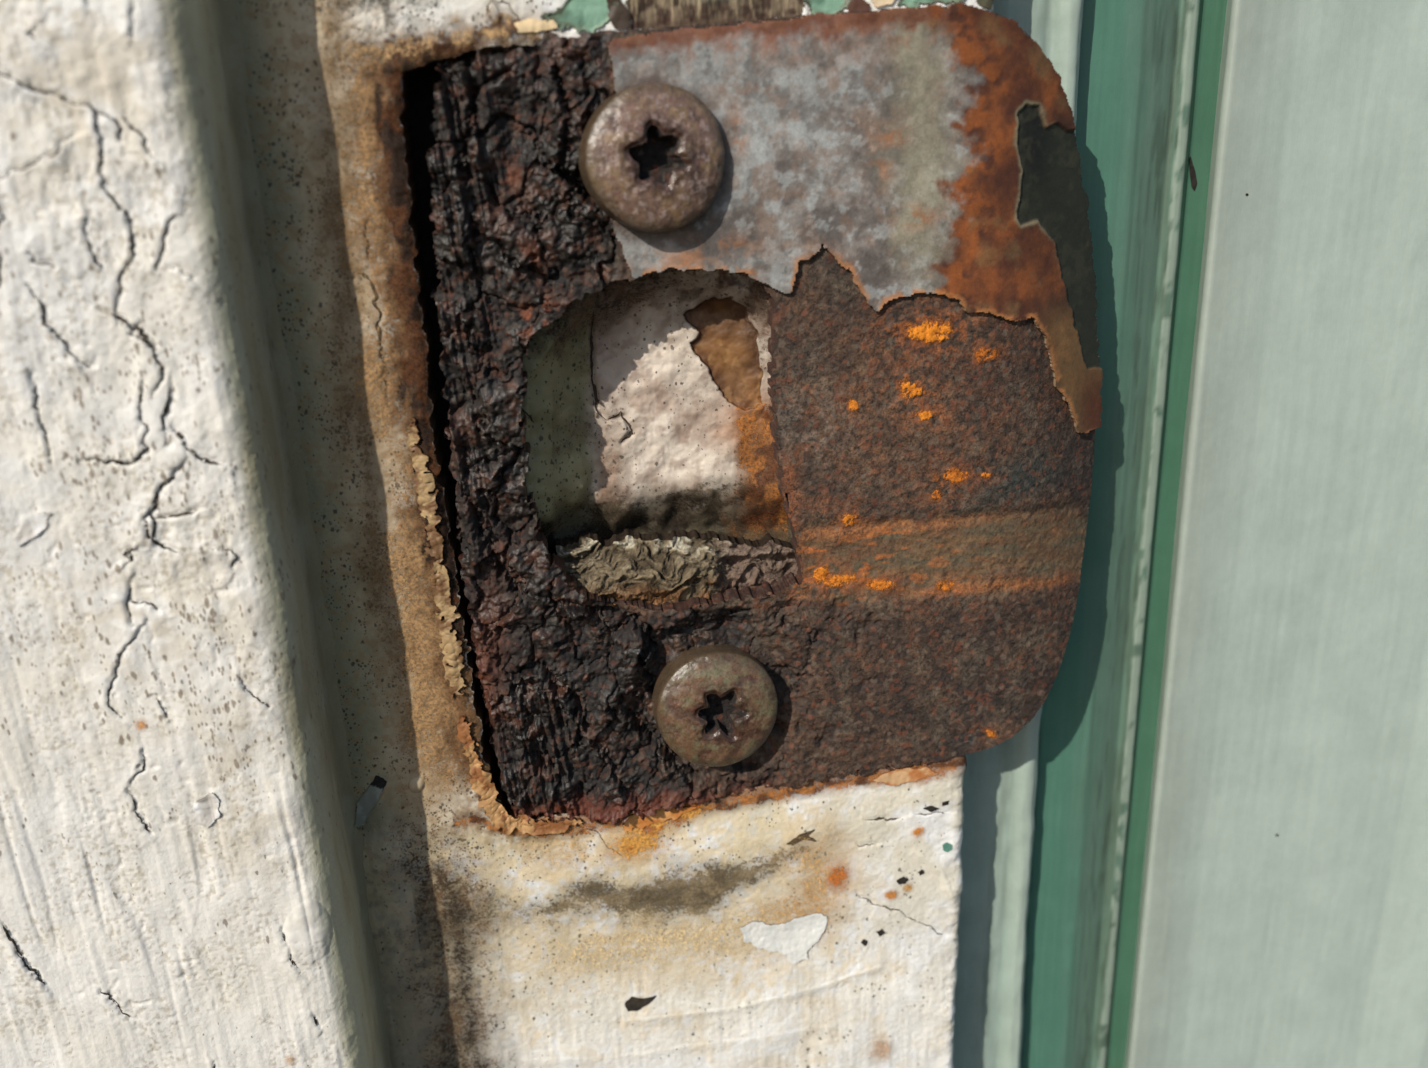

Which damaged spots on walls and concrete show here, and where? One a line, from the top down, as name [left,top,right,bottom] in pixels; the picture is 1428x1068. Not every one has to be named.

peeling [514,0,994,34]
crack [352,226,394,391]
rust [901,319,962,343]
crack [0,73,220,718]
rust [318,0,542,796]
rust [899,380,934,421]
rust [813,564,896,591]
crack [130,756,150,833]
rust [453,756,967,860]
crack [3,926,45,985]
leakage [381,816,851,1068]
peeling [740,913,828,964]